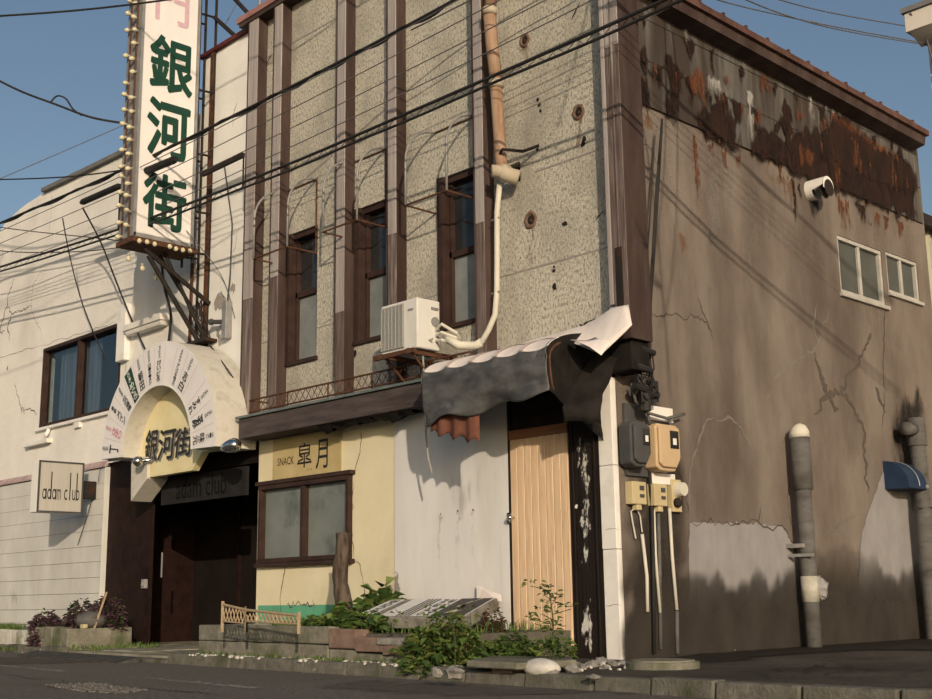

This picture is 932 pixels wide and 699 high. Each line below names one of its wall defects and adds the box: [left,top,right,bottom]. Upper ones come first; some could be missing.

rust [640,45,918,236]
crack [0,257,110,358]
crack [681,308,885,553]
leakage [894,390,922,465]
peeling [575,445,591,559]
leakage [623,477,932,662]
peeling [582,607,592,653]